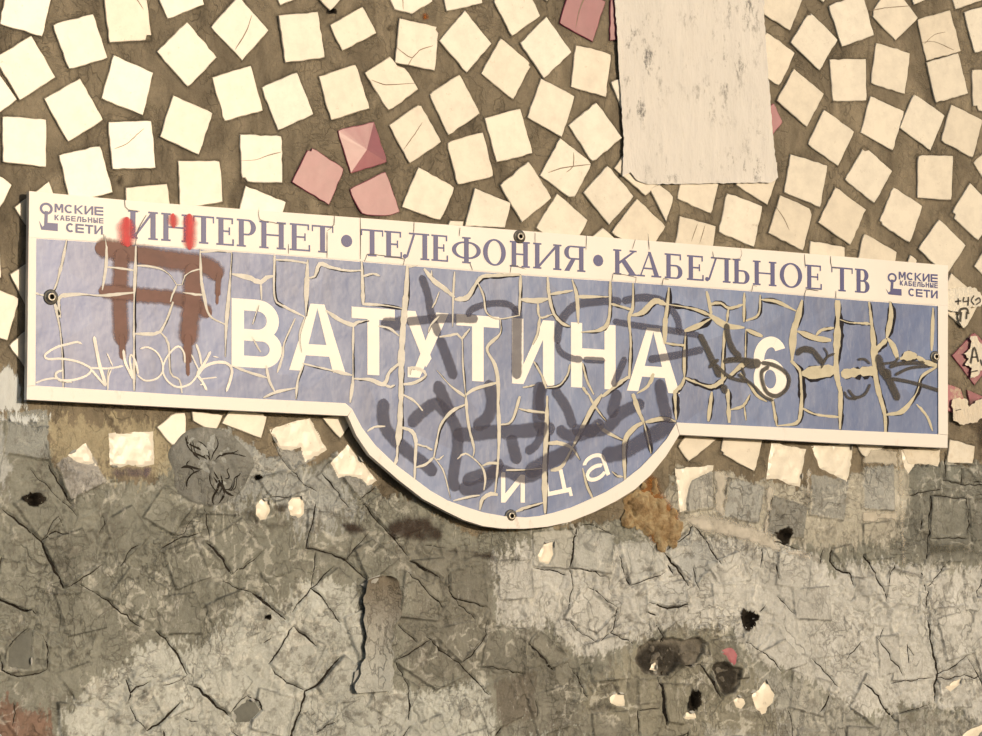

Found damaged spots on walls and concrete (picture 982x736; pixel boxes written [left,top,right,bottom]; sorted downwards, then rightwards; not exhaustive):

crack [0,443,519,736]
crack [533,524,721,644]
crack [760,497,895,613]
crack [847,456,982,736]
crack [529,644,588,698]
spalling [642,640,697,674]
crack [637,664,721,736]
crack [813,660,837,712]